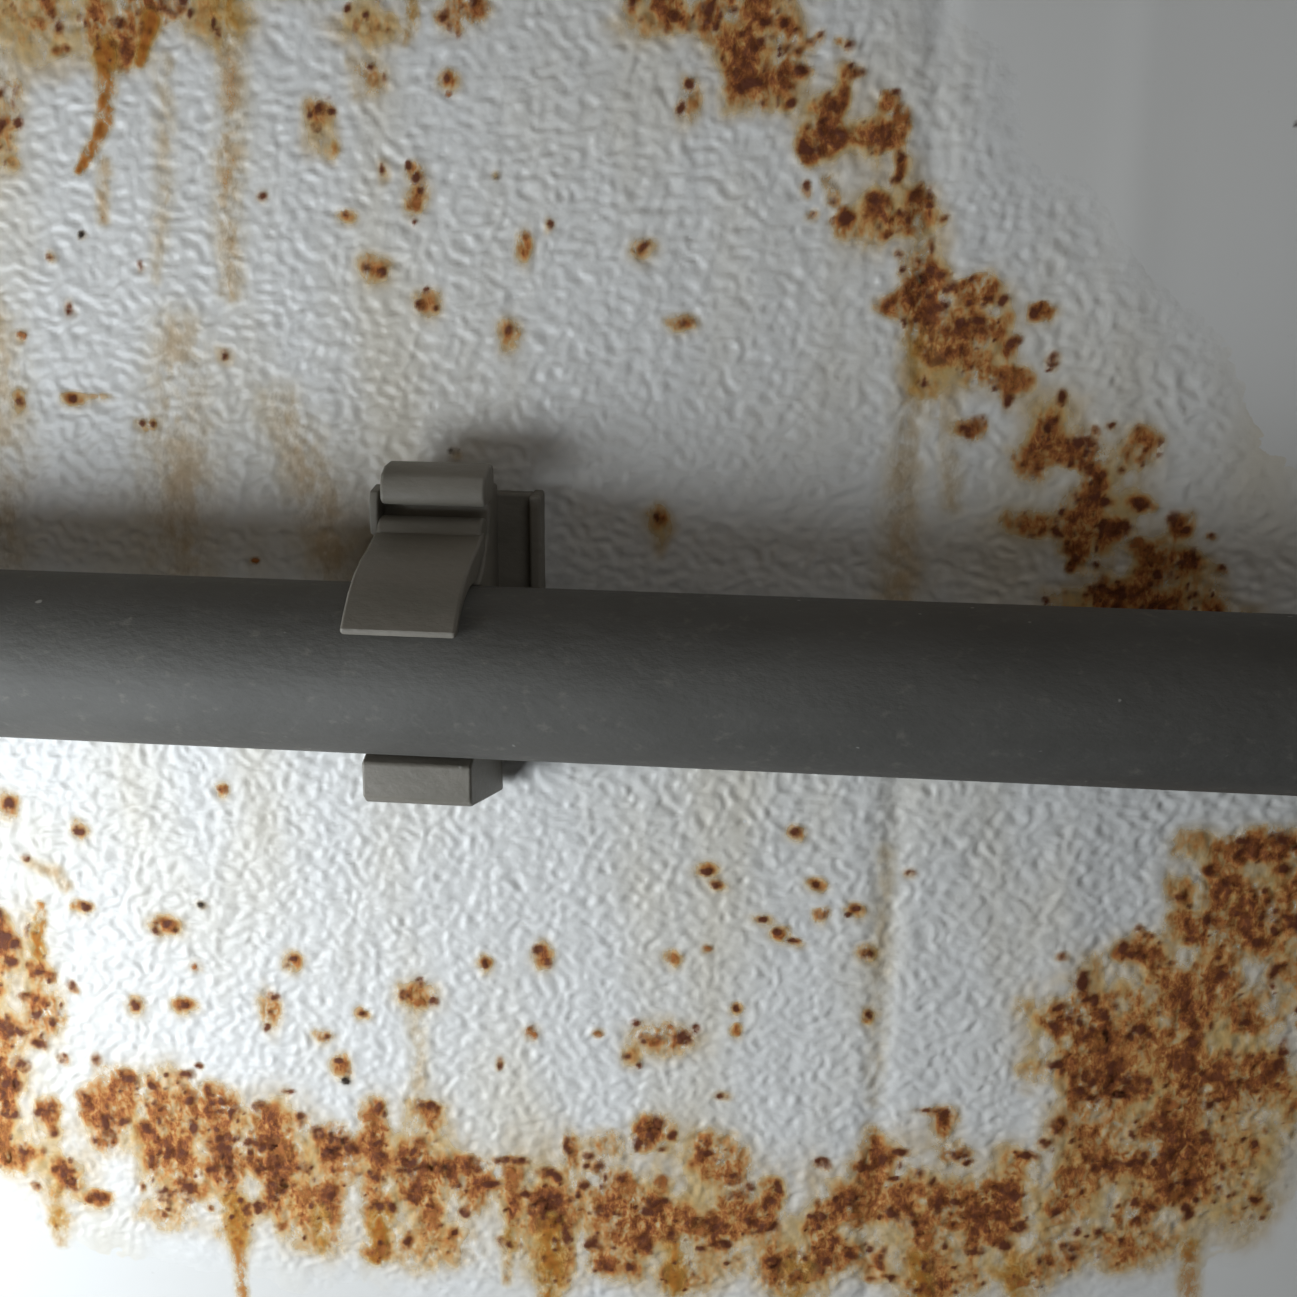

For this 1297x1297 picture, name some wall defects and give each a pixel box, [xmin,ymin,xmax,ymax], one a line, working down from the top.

rust [343,0,488,91]
rust [0,0,249,175]
rust [304,99,340,159]
rust [404,161,428,224]
rust [415,287,441,317]
rust [623,0,1228,612]
rust [61,392,106,406]
rust [0,793,19,816]
rust [71,821,89,839]
rust [70,900,94,913]
rust [0,902,114,1242]
rust [76,825,1297,1297]